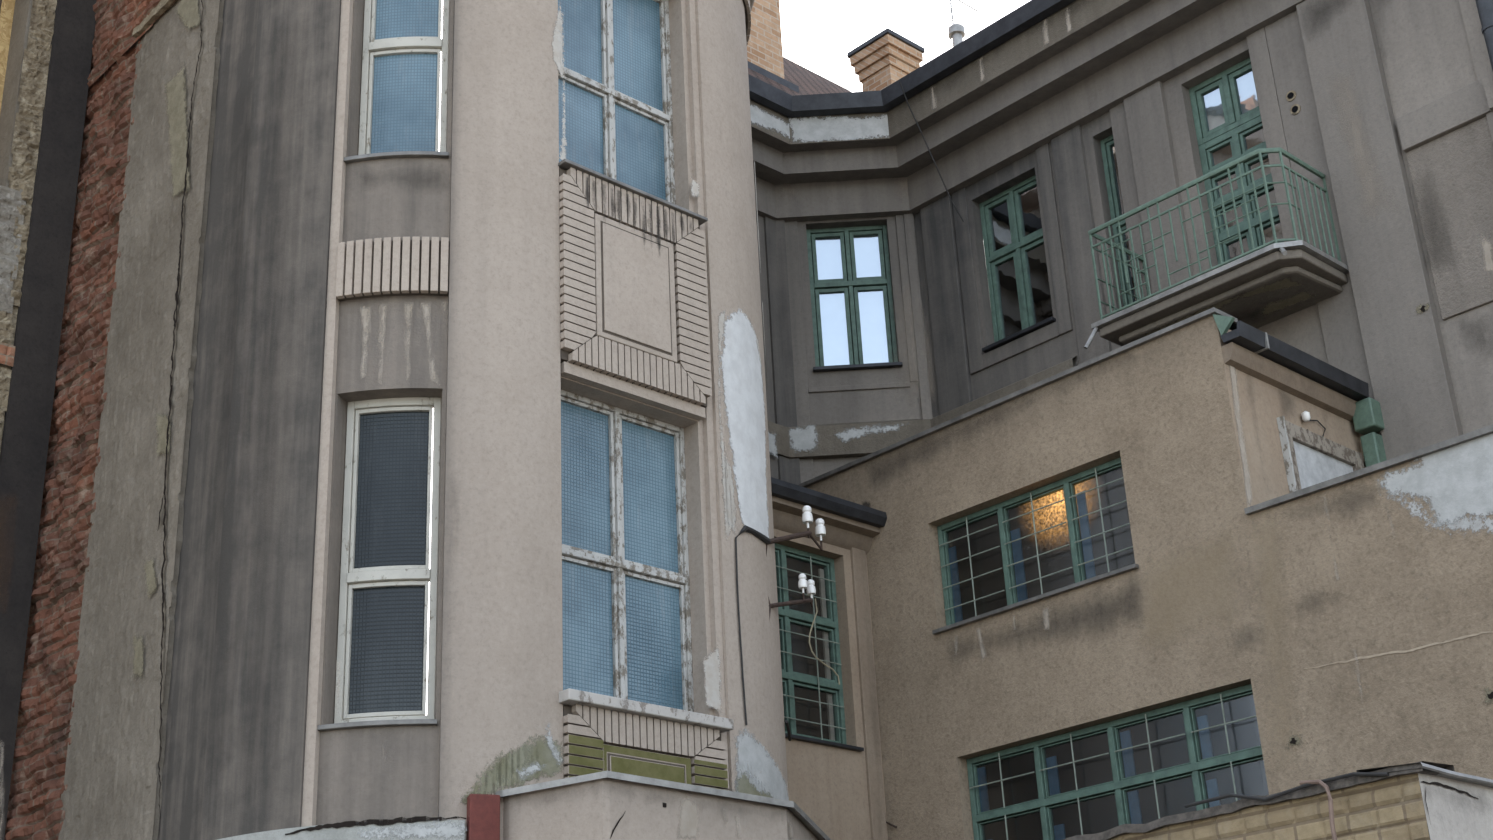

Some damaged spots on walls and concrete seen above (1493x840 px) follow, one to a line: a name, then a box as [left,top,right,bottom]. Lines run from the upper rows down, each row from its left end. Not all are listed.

flaking render [165,68,190,196]
spalling [0,0,57,443]
peeling [718,303,818,541]
peeling [836,424,902,442]
peeling [735,728,789,801]